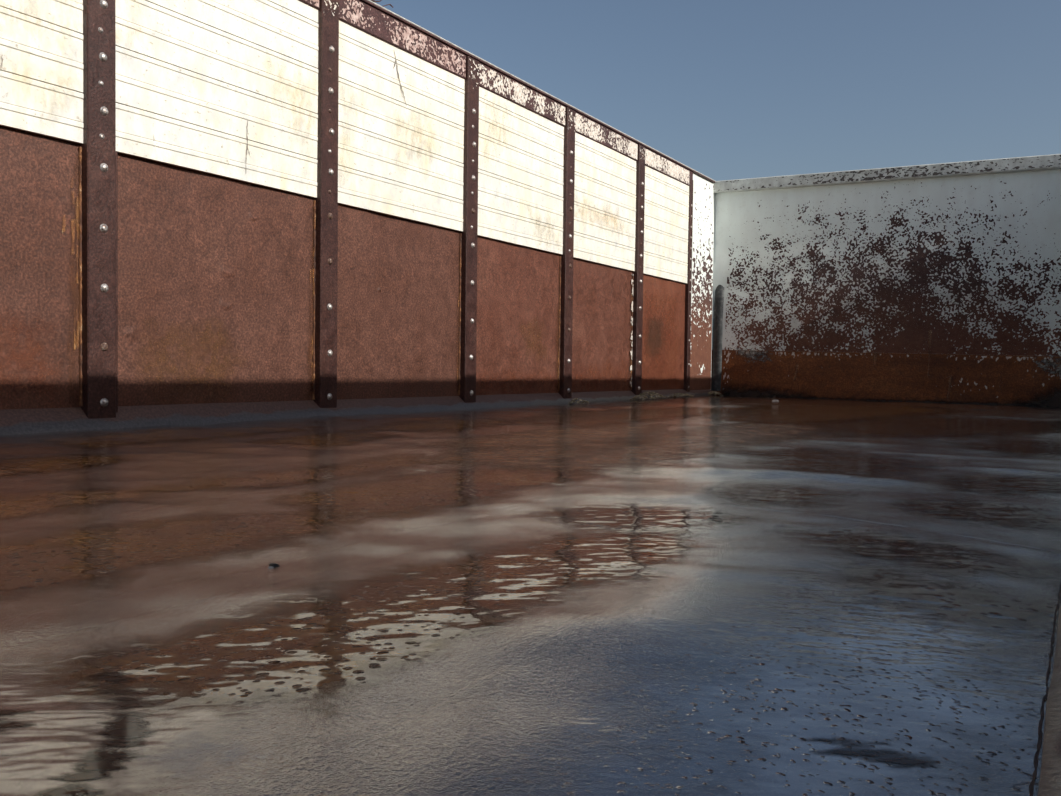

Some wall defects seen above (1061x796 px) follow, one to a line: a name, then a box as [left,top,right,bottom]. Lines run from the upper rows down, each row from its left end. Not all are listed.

peeling [305,0,1061,398]